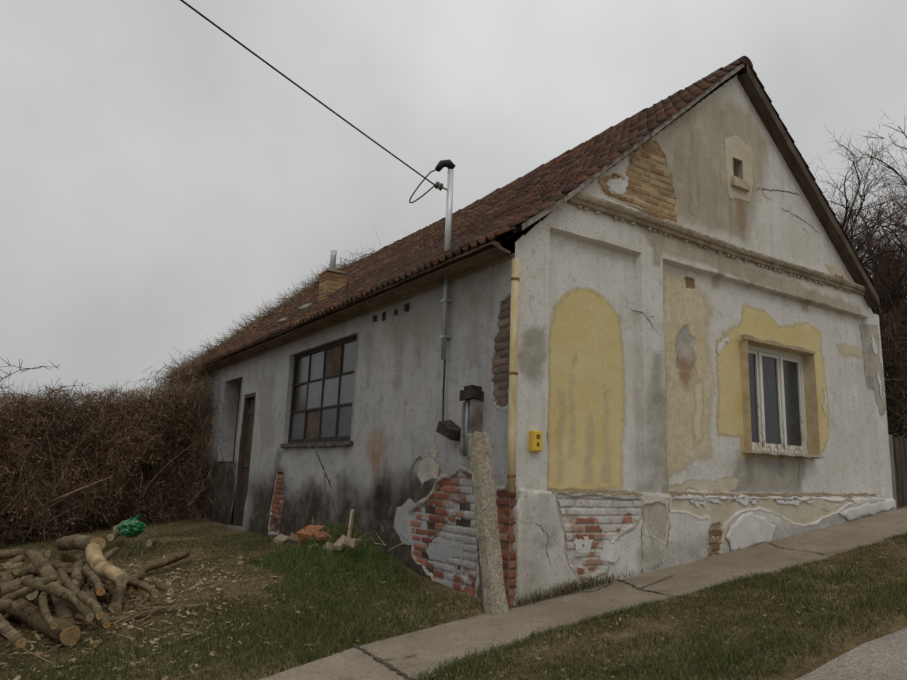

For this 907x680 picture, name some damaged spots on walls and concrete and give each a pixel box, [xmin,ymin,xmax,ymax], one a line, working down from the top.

flaking render [598,137,678,225]
crack [755,188,820,234]
spalling [489,292,511,412]
spalling [676,325,696,381]
flaking render [268,470,299,544]
crack [316,452,333,494]
water stain [249,475,480,593]
flaking render [410,443,480,597]
flaking render [495,485,521,607]
flaking render [547,488,875,580]